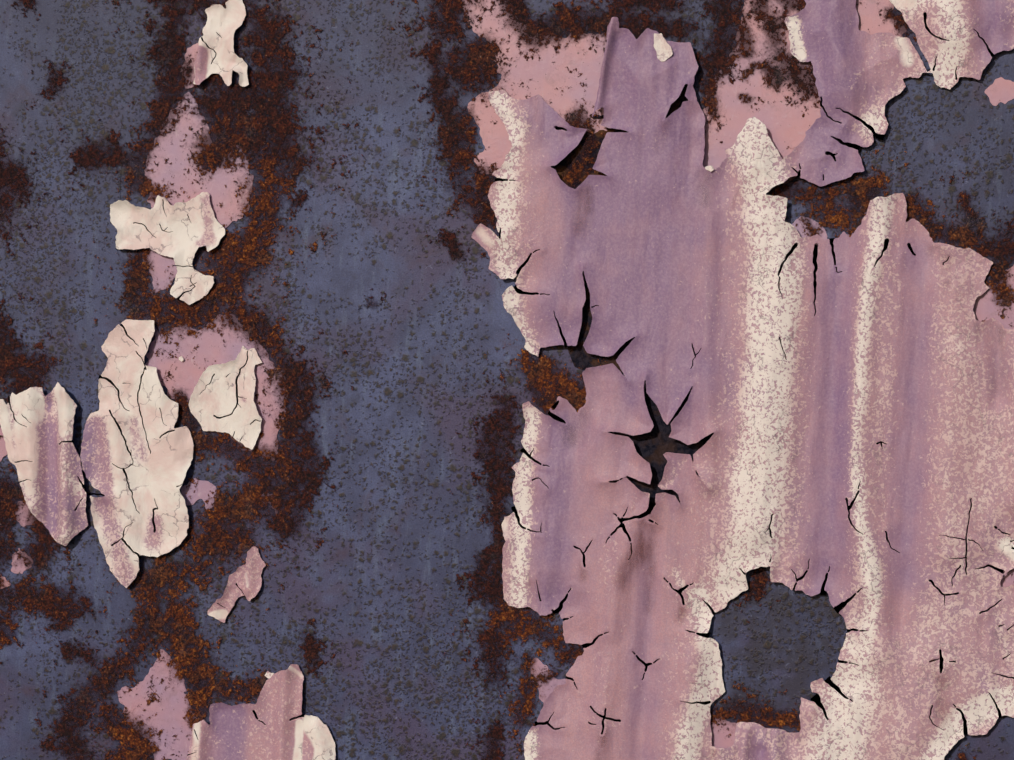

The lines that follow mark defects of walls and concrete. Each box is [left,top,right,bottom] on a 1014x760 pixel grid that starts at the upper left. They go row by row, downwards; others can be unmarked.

rust [387,0,821,275]
peeling [744,0,1014,353]
peeling [0,0,263,760]
rust [0,0,364,760]
peeling [186,0,606,760]
rust [442,329,586,760]
crack [511,249,714,566]
peeling [692,551,865,760]
crack [739,514,867,633]
crack [810,659,859,720]
peeling [907,523,1014,760]
crack [929,498,1014,604]